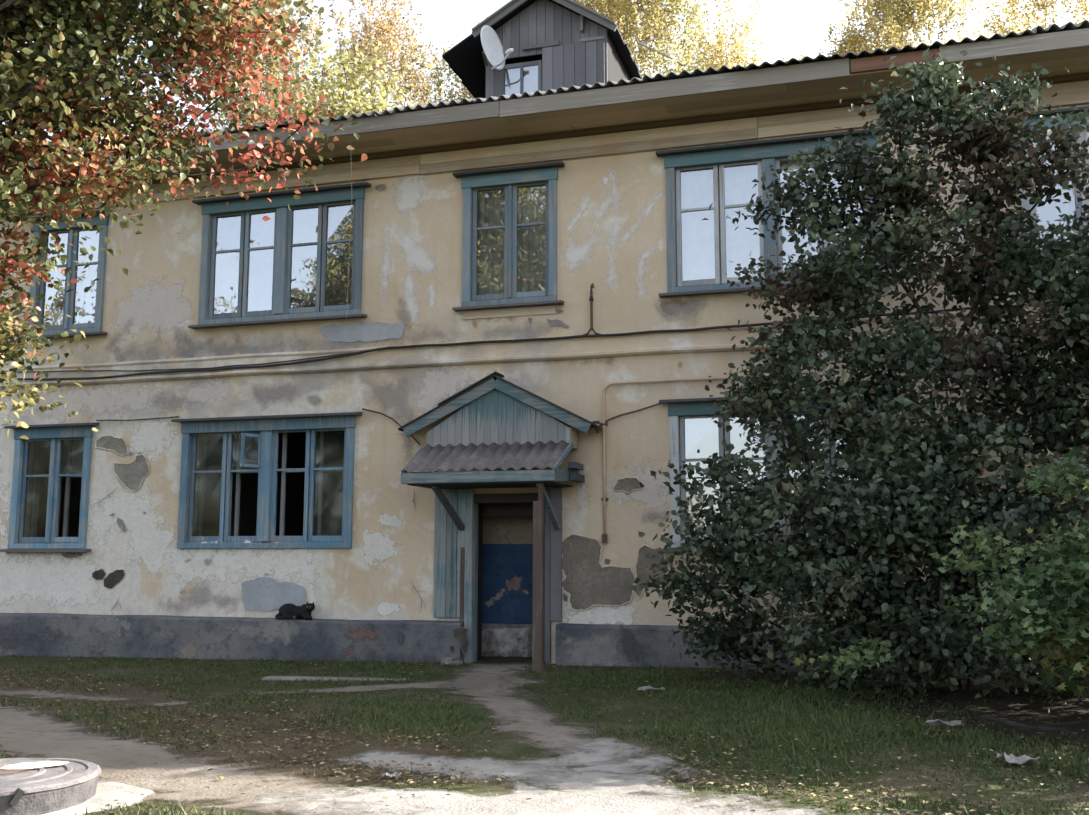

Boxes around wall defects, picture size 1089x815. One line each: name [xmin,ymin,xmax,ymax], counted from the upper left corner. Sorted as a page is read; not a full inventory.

peeling [371,177,426,212]
peeling [565,172,619,269]
peeling [381,236,435,323]
peeling [182,377,232,403]
peeling [0,381,321,609]
peeling [485,575,529,608]
flaking render [562,533,673,666]